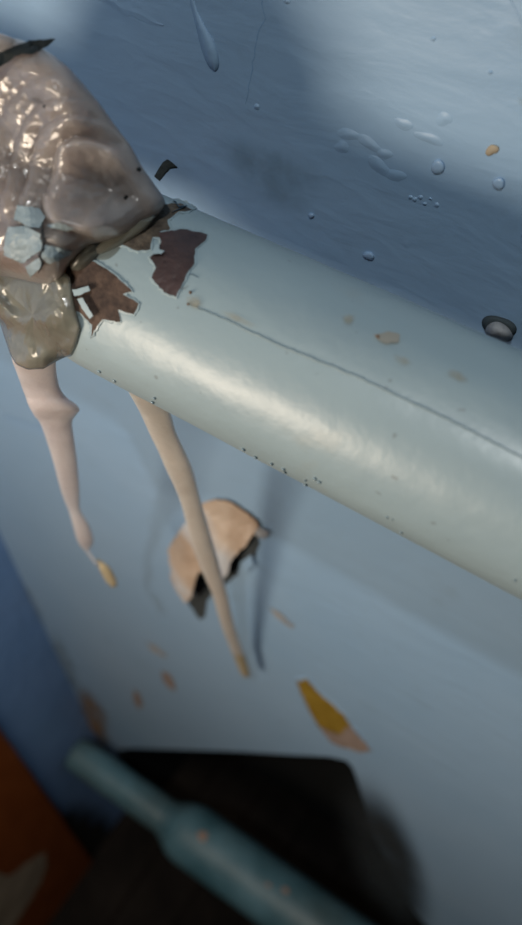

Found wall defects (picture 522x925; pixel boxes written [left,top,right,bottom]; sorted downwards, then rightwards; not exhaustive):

peeling [3,205,141,338]
peeling [119,198,209,299]
flaking render [168,523,212,620]
flaking render [202,499,270,584]
peeling [294,677,373,753]
peeling [0,852,47,925]